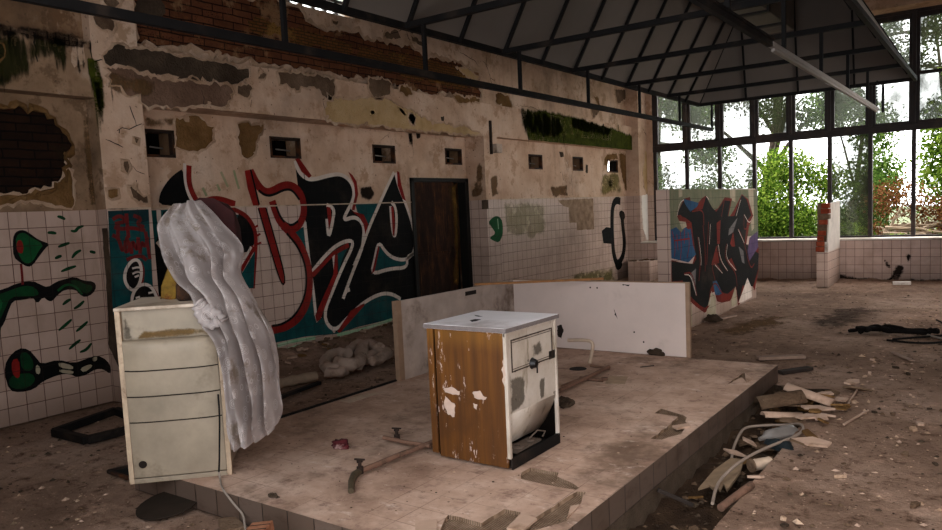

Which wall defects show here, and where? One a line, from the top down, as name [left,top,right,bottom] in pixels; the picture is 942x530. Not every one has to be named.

peeling [89,15,118,35]
water stain [0,23,91,84]
flaking render [100,0,512,155]
flaking render [0,99,77,210]
peeling [234,120,264,162]
peeling [558,198,594,230]
peeling [656,411,686,440]
peeling [442,513,518,530]
peeling [521,471,583,530]